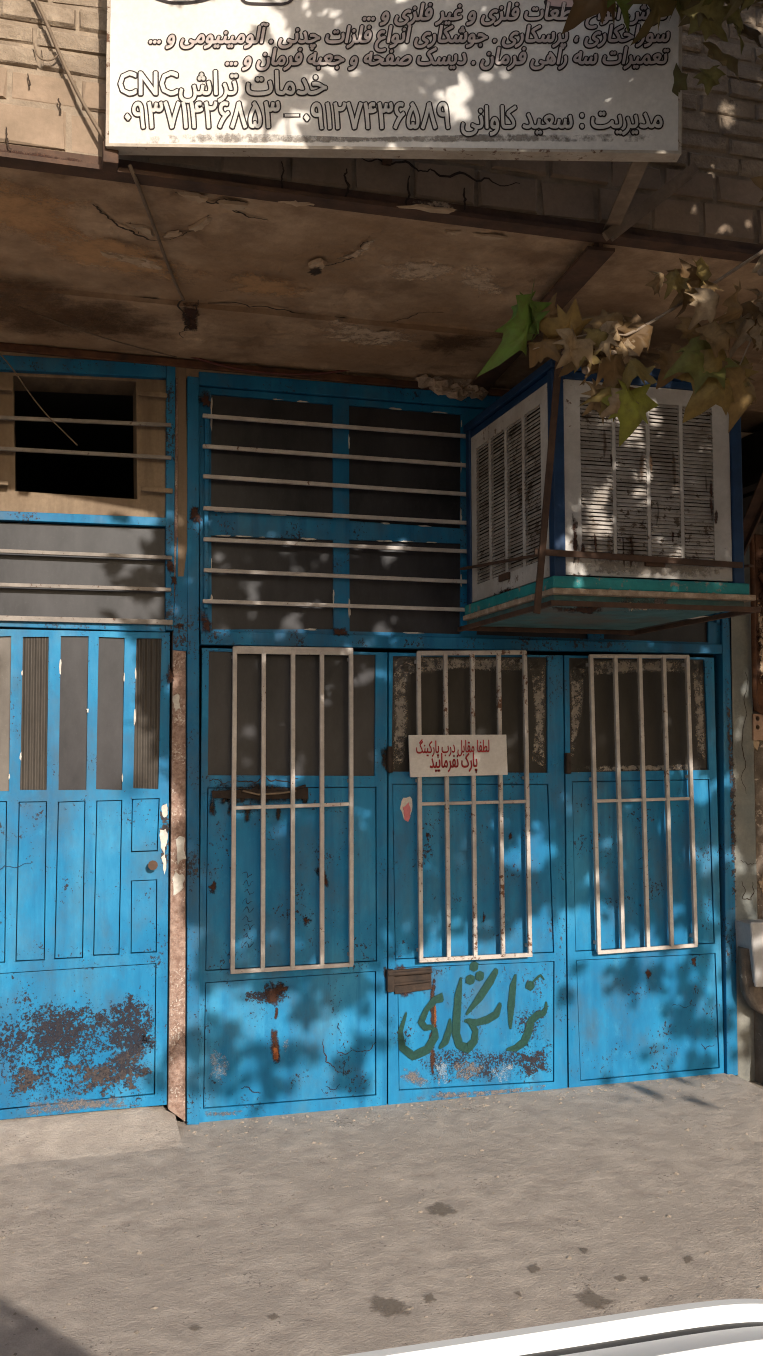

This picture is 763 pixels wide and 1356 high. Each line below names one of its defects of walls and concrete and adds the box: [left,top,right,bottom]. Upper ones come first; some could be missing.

crack [92,204,211,241]
spalling [308,241,373,276]
spalling [415,374,488,414]
rust [705,480,718,524]
rust [572,518,717,577]
spalling [159,804,186,895]
rust [240,981,291,1063]